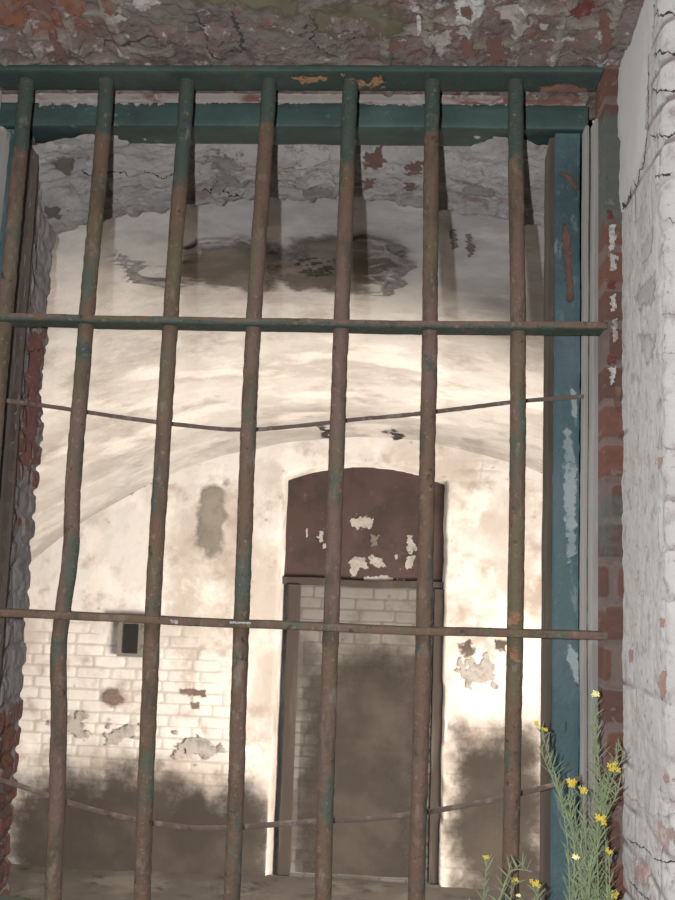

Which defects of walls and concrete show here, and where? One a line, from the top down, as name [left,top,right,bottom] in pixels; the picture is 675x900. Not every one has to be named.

peeling [412,0,549,59]
rust [292,74,329,84]
rust [341,73,386,92]
crack [622,49,675,210]
peeling [608,224,619,271]
peeling [610,293,619,343]
peeling [19,327,46,477]
damp [197,483,228,557]
peeling [348,513,417,581]
rust [508,610,522,626]
rust [103,689,124,706]
rust [180,689,206,709]